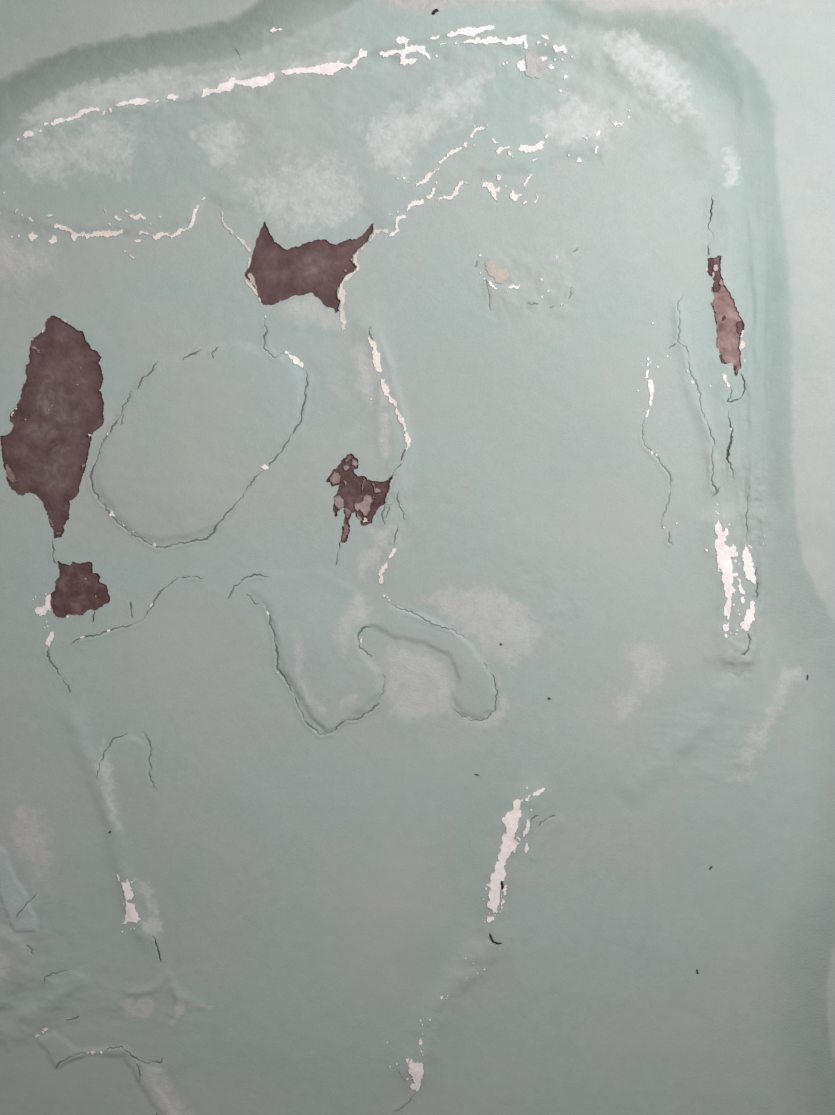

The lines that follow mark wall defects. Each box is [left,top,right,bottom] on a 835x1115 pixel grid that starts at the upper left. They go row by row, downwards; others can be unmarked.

peeling [201,25,573,98]
peeling [221,124,550,331]
water stain [0,0,835,299]
peeling [0,316,104,538]
peeling [33,561,110,628]
water stain [273,294,394,468]
peeling [326,453,394,543]
water stain [287,515,554,733]
crack [642,419,678,543]
peeling [705,255,746,376]
water stain [666,20,835,1115]
water stain [90,733,125,836]